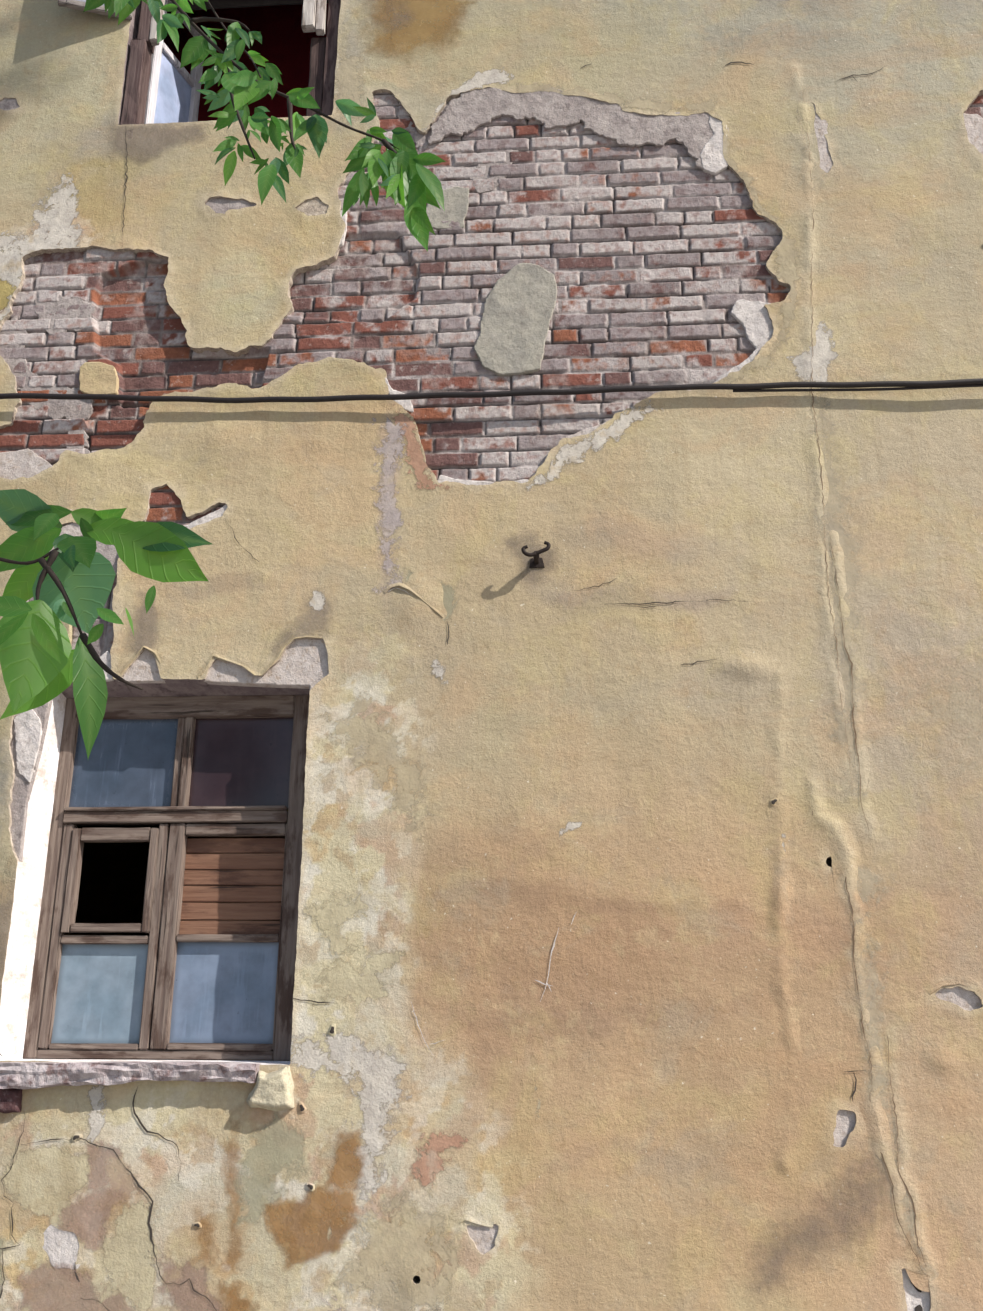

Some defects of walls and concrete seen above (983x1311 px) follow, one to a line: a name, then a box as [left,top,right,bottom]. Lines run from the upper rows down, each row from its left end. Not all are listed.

water stain [373,0,465,53]
spalling [0,50,791,491]
peeling [786,321,838,389]
spalling [143,484,228,529]
spalling [49,522,166,684]
peeling [196,633,329,695]
crack [725,60,943,1292]
spalling [9,699,53,862]
crack [0,1113,217,1311]
crack [132,1087,181,1179]
peeling [291,1023,499,1311]
spalling [902,1268,931,1311]